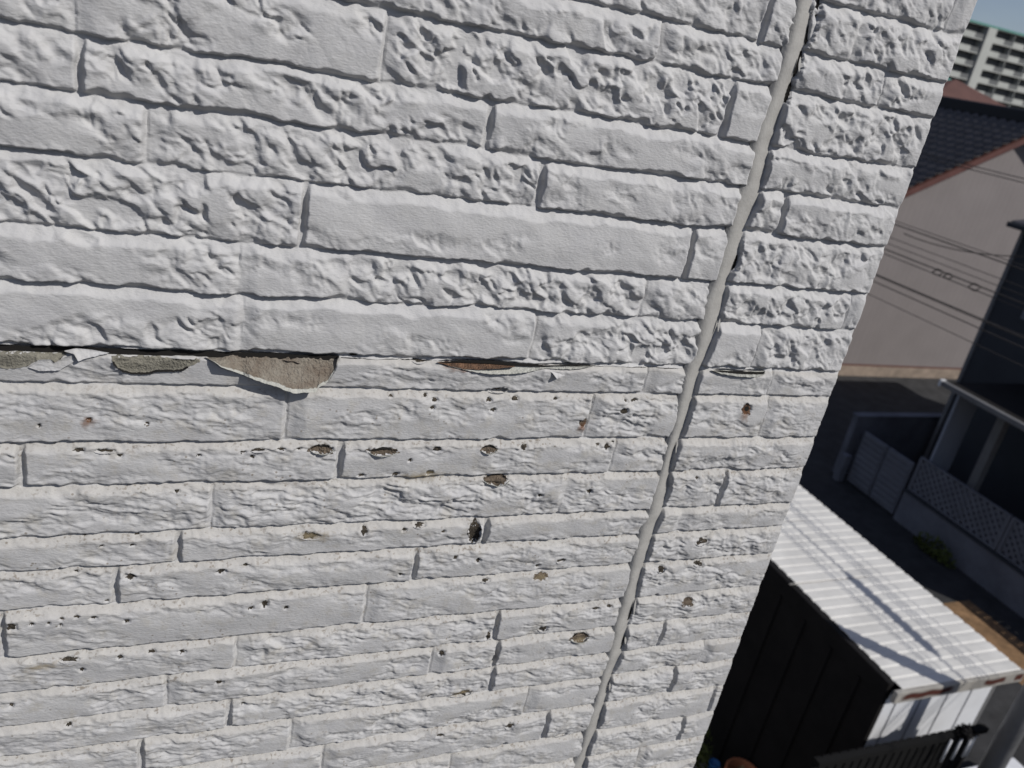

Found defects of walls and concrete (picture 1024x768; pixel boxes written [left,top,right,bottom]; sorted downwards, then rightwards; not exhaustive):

peeling [0,348,357,394]
peeling [412,358,594,379]
spalling [307,444,334,455]
spalling [365,447,400,457]
spalling [480,444,498,455]
spalling [483,474,509,487]
spalling [467,518,483,543]
spalling [570,632,590,644]